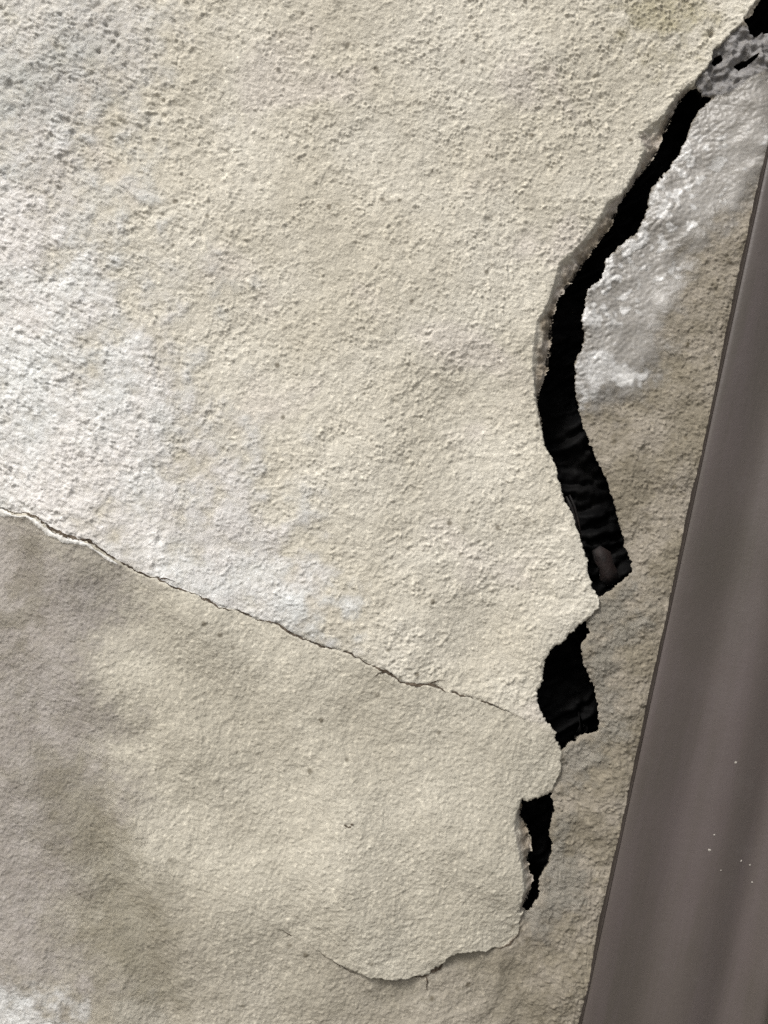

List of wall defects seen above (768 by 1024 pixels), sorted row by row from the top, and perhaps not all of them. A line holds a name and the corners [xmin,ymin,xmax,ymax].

crack [0,508,515,716]